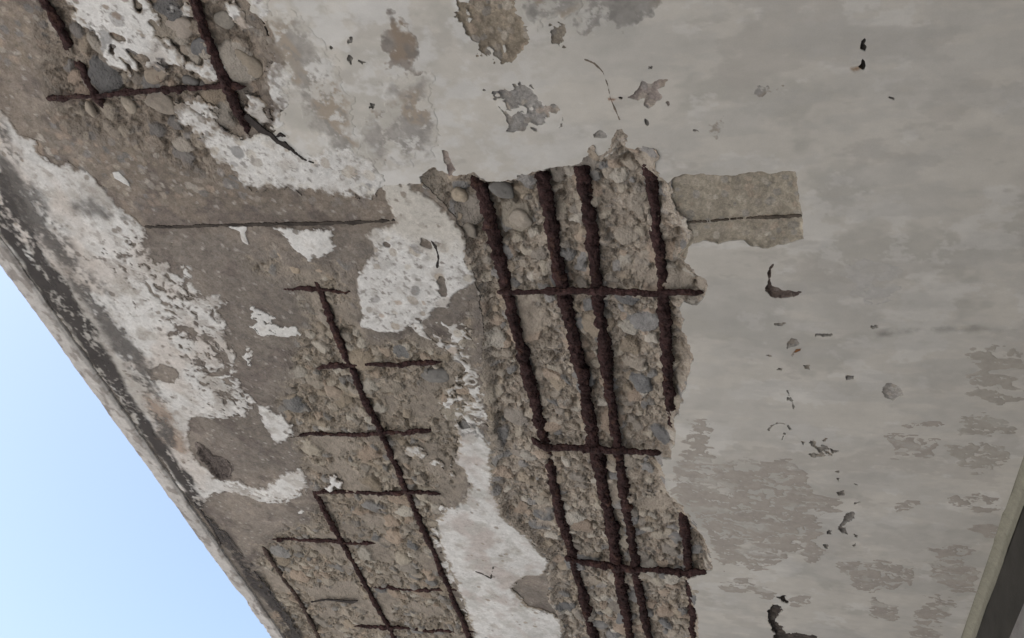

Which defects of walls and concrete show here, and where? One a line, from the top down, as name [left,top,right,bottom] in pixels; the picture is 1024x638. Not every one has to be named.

damp [0,154,302,638]
spalling [0,0,626,638]
peeling [454,0,663,64]
peeling [619,66,670,126]
spalling [544,129,855,638]